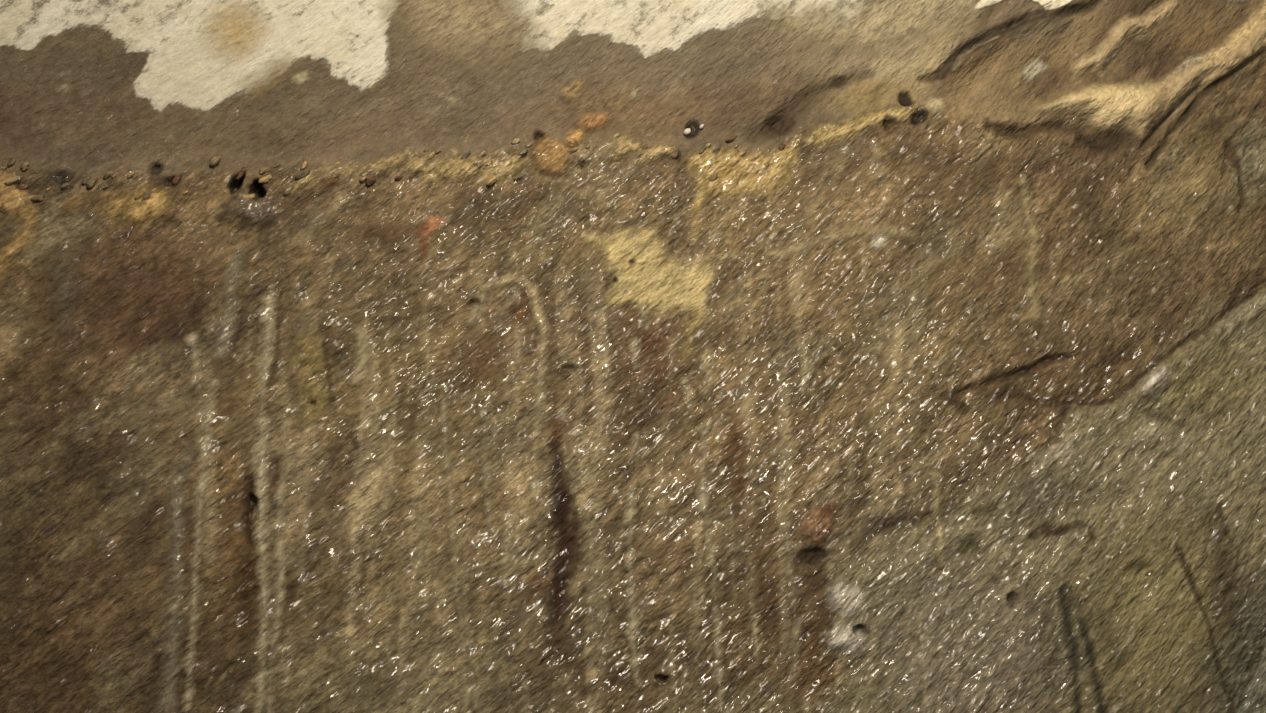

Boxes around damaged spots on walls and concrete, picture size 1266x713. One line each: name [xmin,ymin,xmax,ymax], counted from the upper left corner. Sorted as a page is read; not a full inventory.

peeling [0,0,402,111]
leakage [399,0,530,60]
peeling [512,0,864,58]
peeling [975,0,1001,9]
peeling [1033,0,1072,9]
spalling [283,87,638,206]
leakage [68,182,168,224]
spalling [228,163,281,199]
leakage [583,229,717,406]
leakage [253,296,285,713]
leakage [159,381,215,713]
leakage [829,584,865,651]